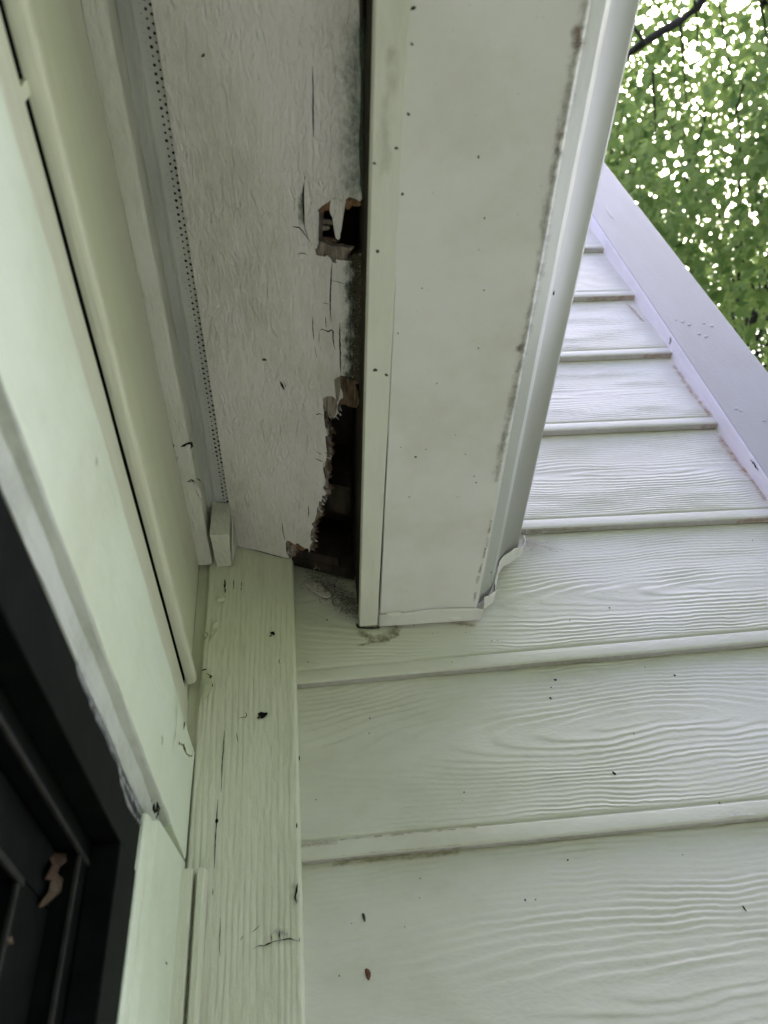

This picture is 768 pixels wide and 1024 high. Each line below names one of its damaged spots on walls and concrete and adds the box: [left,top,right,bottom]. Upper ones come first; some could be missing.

crack [309,66,317,134]
crack [293,179,309,255]
crack [312,267,344,374]
damp [345,251,362,382]